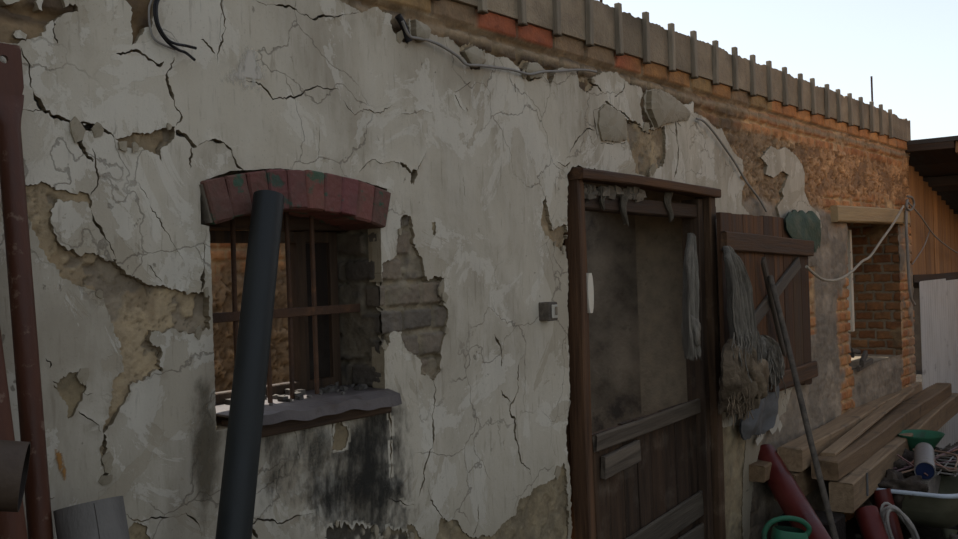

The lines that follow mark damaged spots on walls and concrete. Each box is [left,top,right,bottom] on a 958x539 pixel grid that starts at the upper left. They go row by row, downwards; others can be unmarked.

flaking render [0,0,73,44]
flaking render [126,0,152,52]
crack [34,98,93,159]
spalling [117,123,172,154]
flaking render [340,0,916,459]
spalling [26,182,209,486]
peeling [436,465,570,539]
peeling [723,425,784,539]
flaking render [806,480,863,521]
peeling [128,519,149,539]
peeling [325,520,420,539]